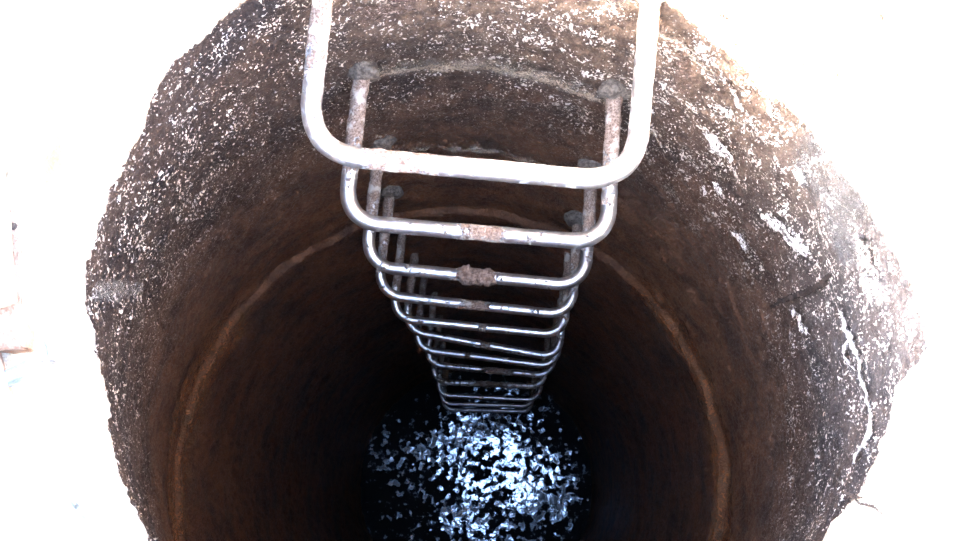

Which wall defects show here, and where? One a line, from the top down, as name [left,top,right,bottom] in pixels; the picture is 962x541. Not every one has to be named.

corrosion [465,224,498,241]
crack [770,273,873,464]
crack [843,490,883,514]